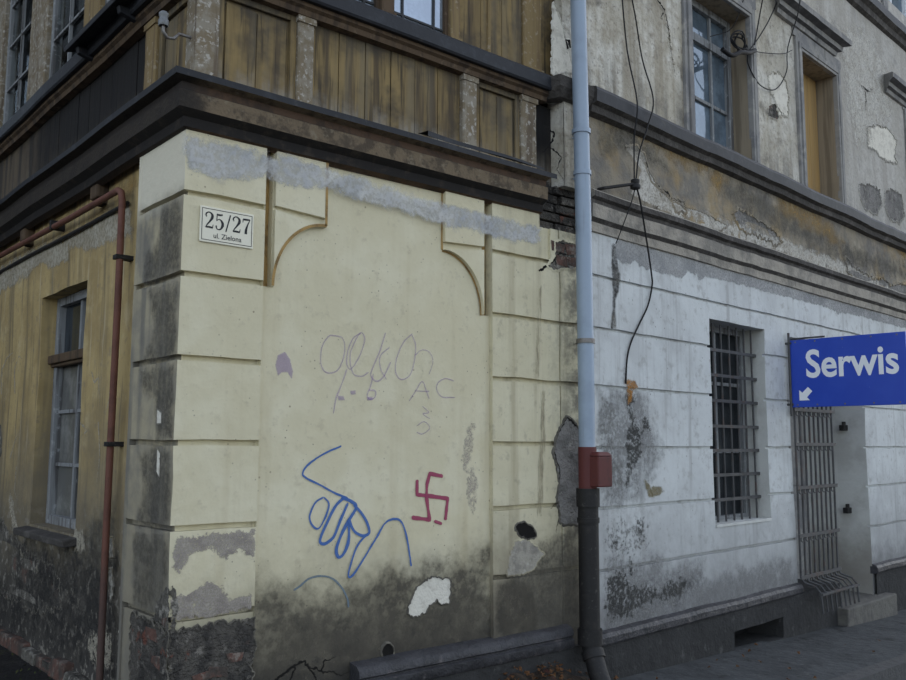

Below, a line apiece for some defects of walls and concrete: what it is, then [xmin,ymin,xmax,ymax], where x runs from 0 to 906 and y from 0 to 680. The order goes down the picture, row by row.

peeling [767,69,790,122]
peeling [625,143,783,248]
flaking render [858,182,905,226]
water stain [612,391,650,488]
flaking render [551,415,579,527]
water stain [73,527,85,552]
peeling [173,529,255,574]
peeling [506,521,545,577]
flaking render [406,576,452,618]
water stain [604,537,794,625]
water stain [88,633,112,668]
crack [275,656,350,680]